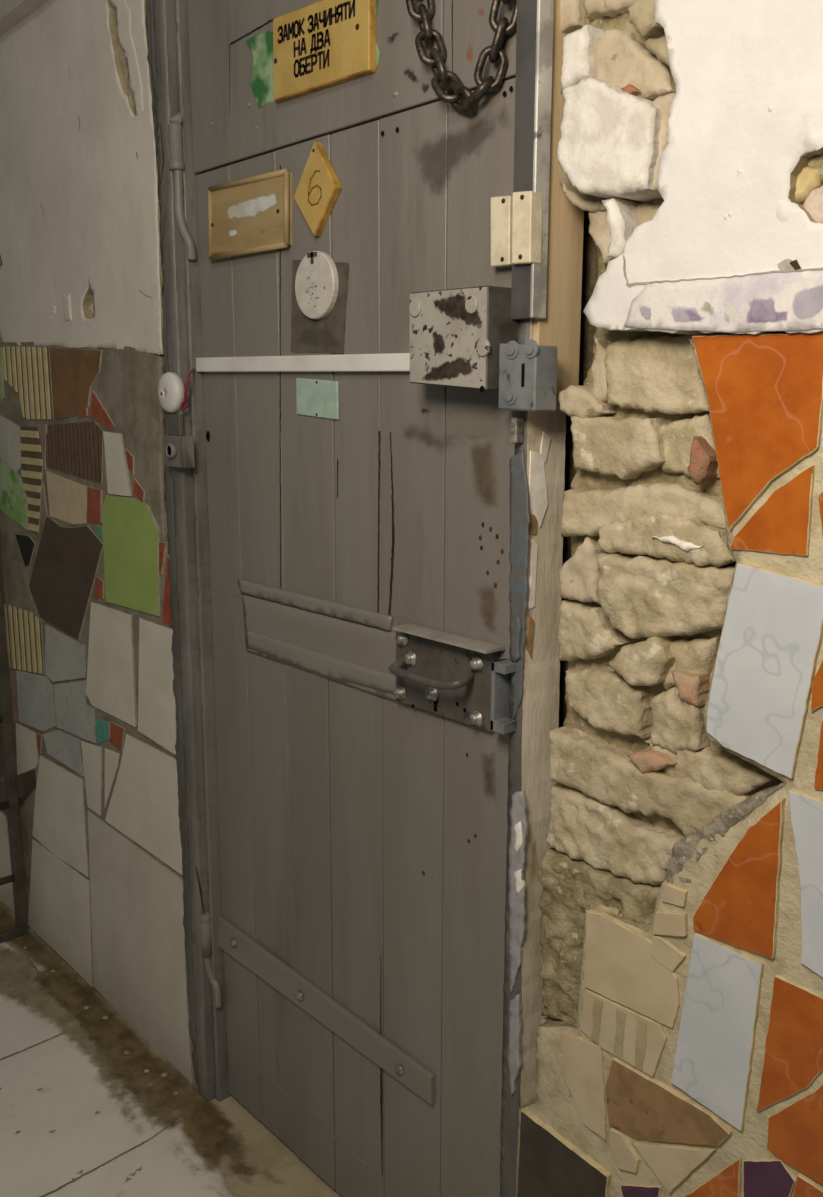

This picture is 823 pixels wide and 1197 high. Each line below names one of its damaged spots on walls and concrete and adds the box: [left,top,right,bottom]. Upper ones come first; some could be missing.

flaking render [556,0,676,280]
flaking render [795,153,823,224]
flaking render [479,327,782,1095]
water stain [36,966,249,1174]